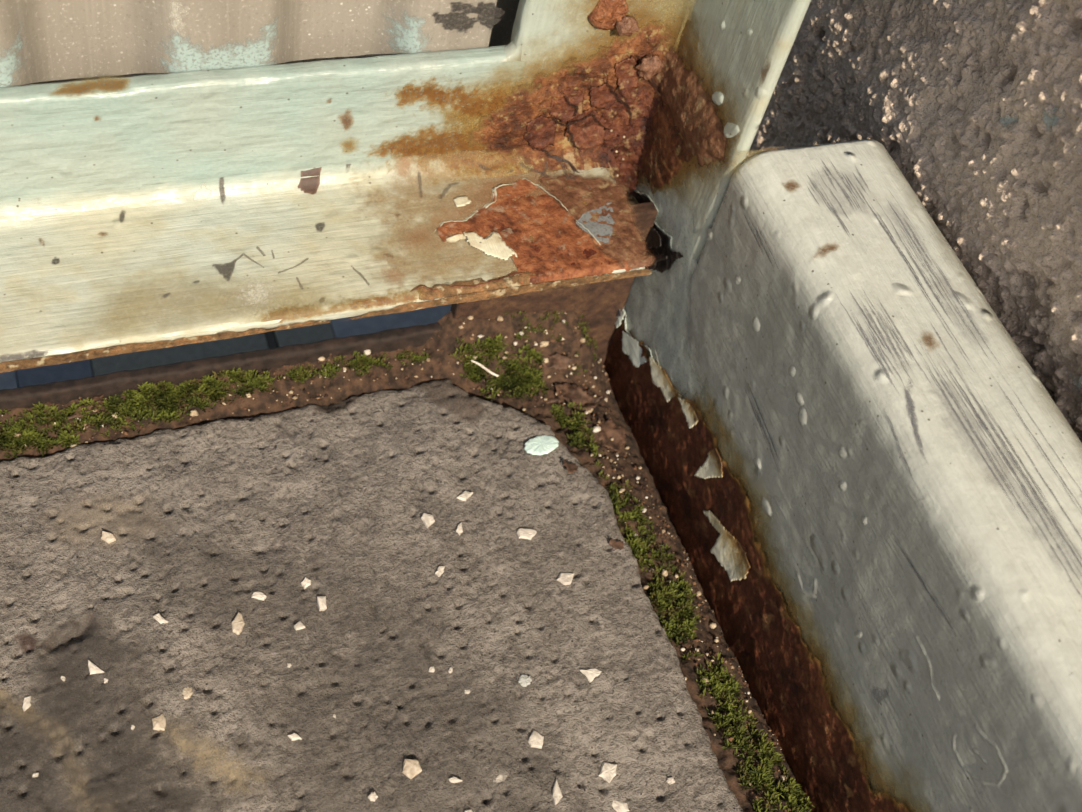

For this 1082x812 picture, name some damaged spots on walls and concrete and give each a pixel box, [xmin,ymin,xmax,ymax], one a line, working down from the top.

corrosion [53,79,128,96]
corrosion [370,0,740,195]
peeling [432,173,701,429]
peeling [694,447,723,479]
peeling [703,510,750,582]
corrosion [604,316,916,812]